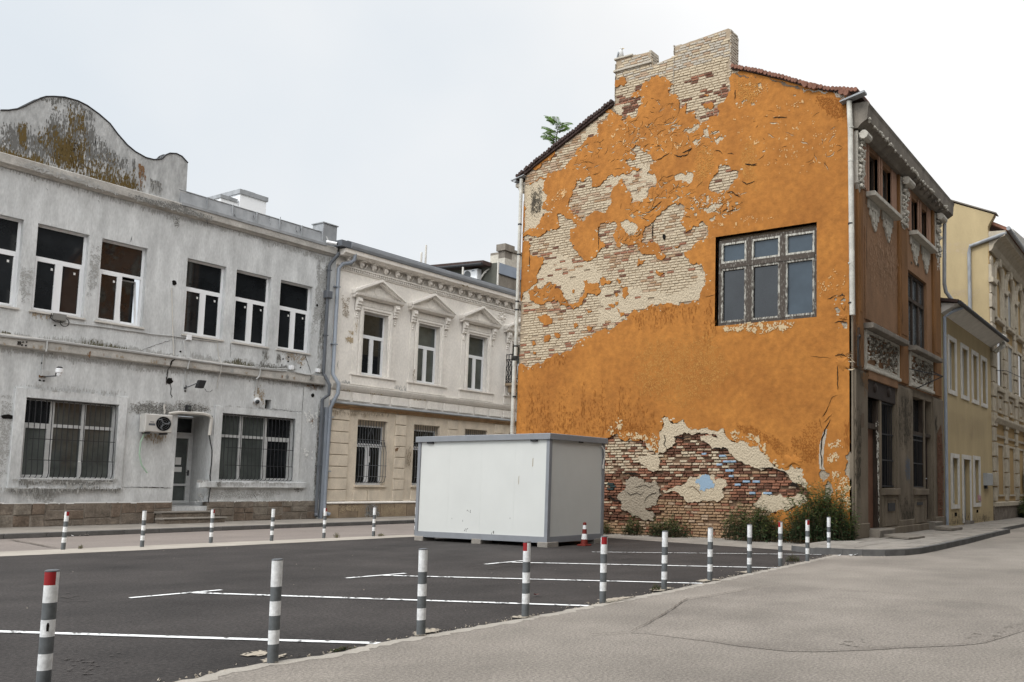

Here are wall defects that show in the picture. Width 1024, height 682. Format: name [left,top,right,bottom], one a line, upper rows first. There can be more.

water stain [0,97,332,504]
flaking render [519,28,837,370]
flaking render [604,418,851,537]
crack [813,352,855,467]